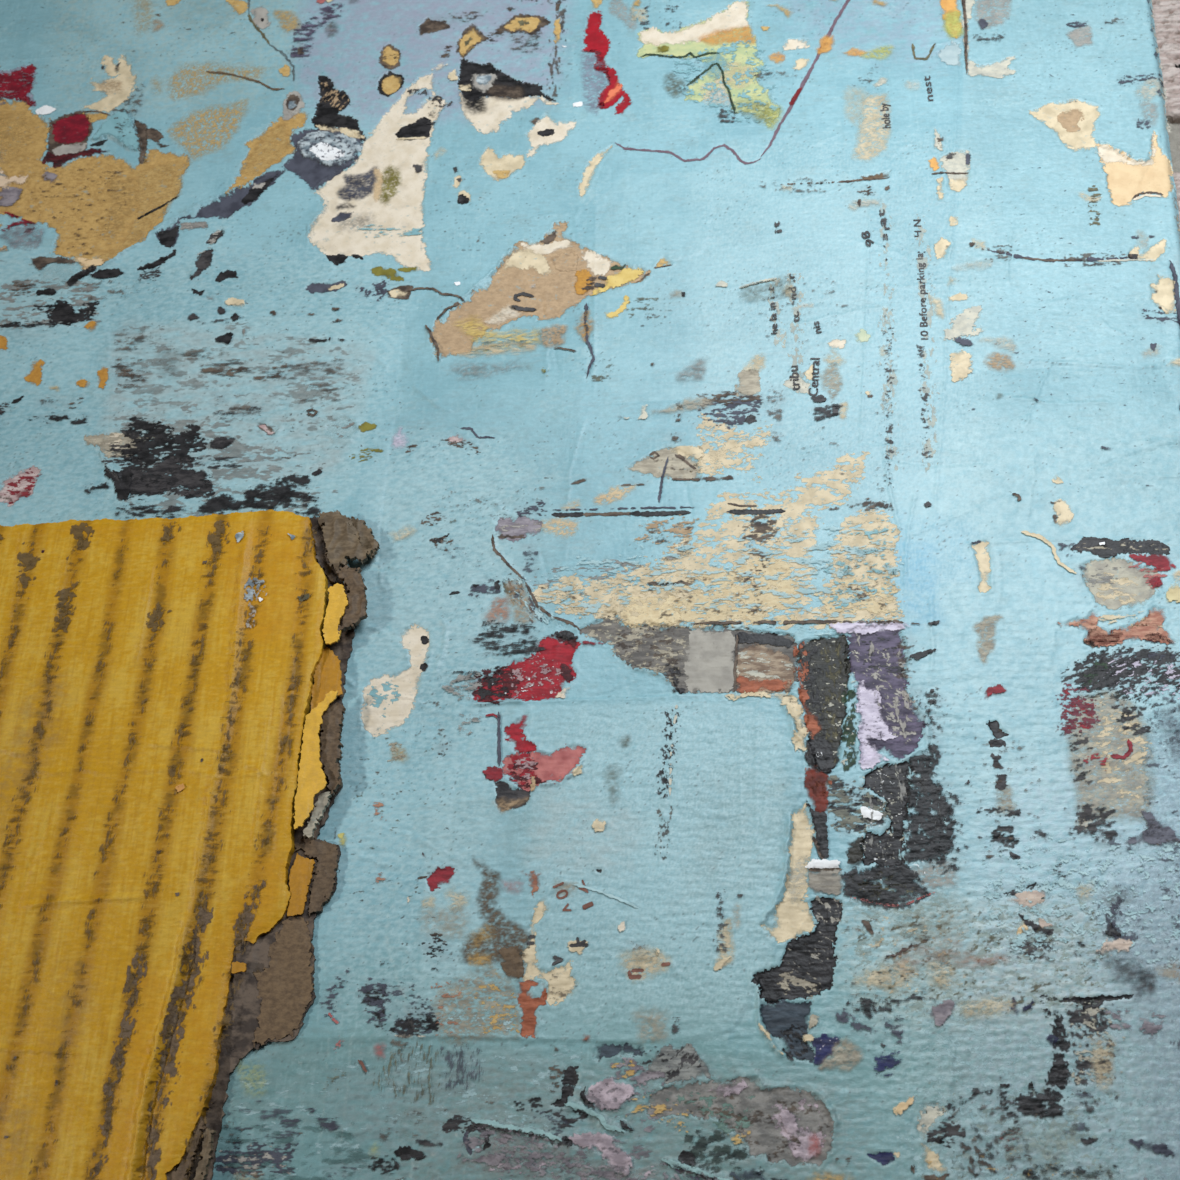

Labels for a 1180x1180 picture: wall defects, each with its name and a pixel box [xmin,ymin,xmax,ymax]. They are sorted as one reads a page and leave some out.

peeling [573,0,650,114]
peeling [755,36,833,82]
peeling [911,0,1016,78]
peeling [1066,14,1092,46]
peeling [0,99,190,270]
peeling [1029,73,1173,225]
peeling [188,230,248,344]
peeling [306,221,671,381]
peeling [1051,499,1074,525]
peeling [361,355,1046,1070]
peeling [437,1036,852,1180]
peeling [867,1000,1180,1180]